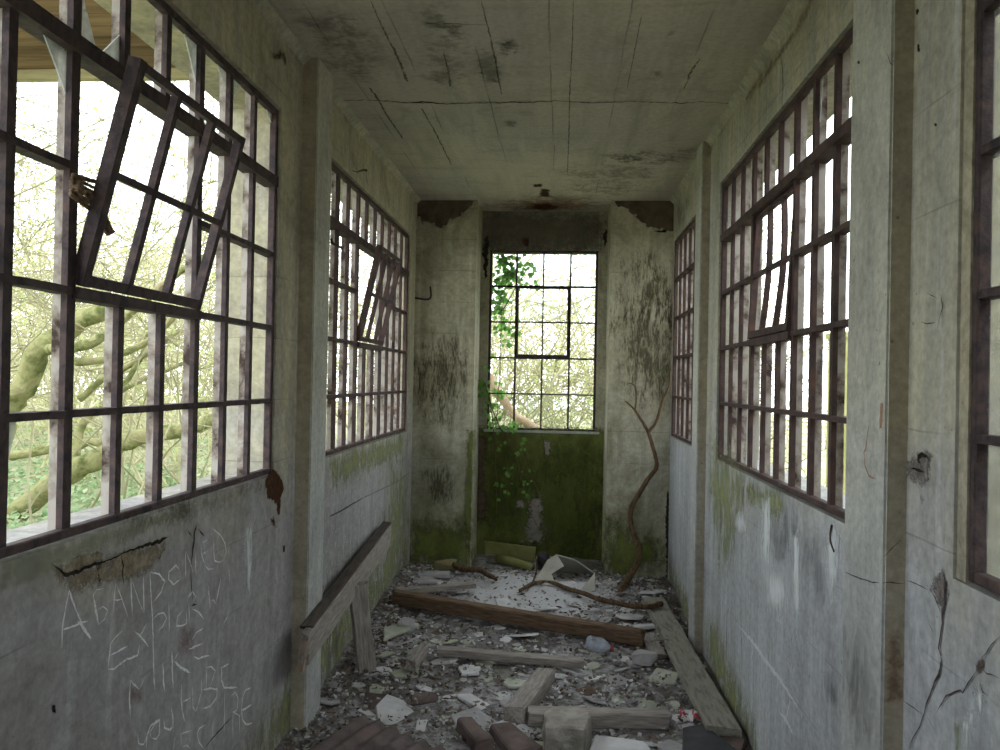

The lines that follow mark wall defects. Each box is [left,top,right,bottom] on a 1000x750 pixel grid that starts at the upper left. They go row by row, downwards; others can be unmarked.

crack [345,1,728,173]
peeling [417,200,474,228]
peeling [615,201,674,233]
leakage [414,337,467,425]
corrosion [265,470,284,527]
leakage [477,436,488,521]
spalling [906,451,931,485]
spalling [52,537,167,591]
leakage [762,498,799,636]
leakage [818,526,839,593]
crack [846,572,998,748]